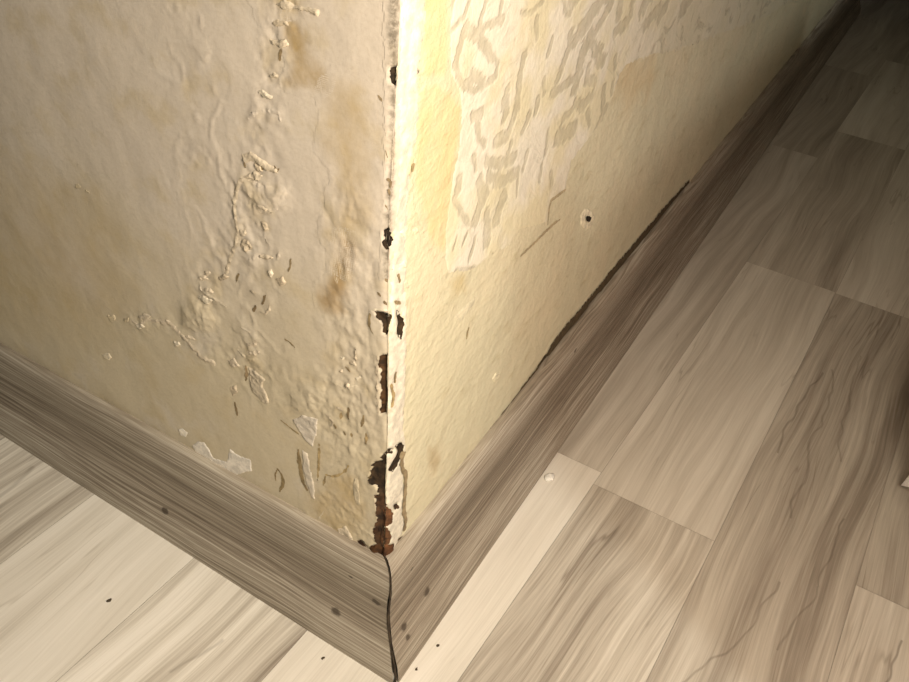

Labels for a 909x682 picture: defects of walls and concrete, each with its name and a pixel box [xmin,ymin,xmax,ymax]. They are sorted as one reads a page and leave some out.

peeling [272,0,319,27]
peeling [241,151,279,181]
damp [247,0,384,326]
damp [410,0,462,258]
peeling [241,239,286,286]
spalling [368,0,426,547]
peeling [193,441,252,475]
spalling [325,407,353,437]
corrosion [357,449,402,559]
crack [384,556,396,682]